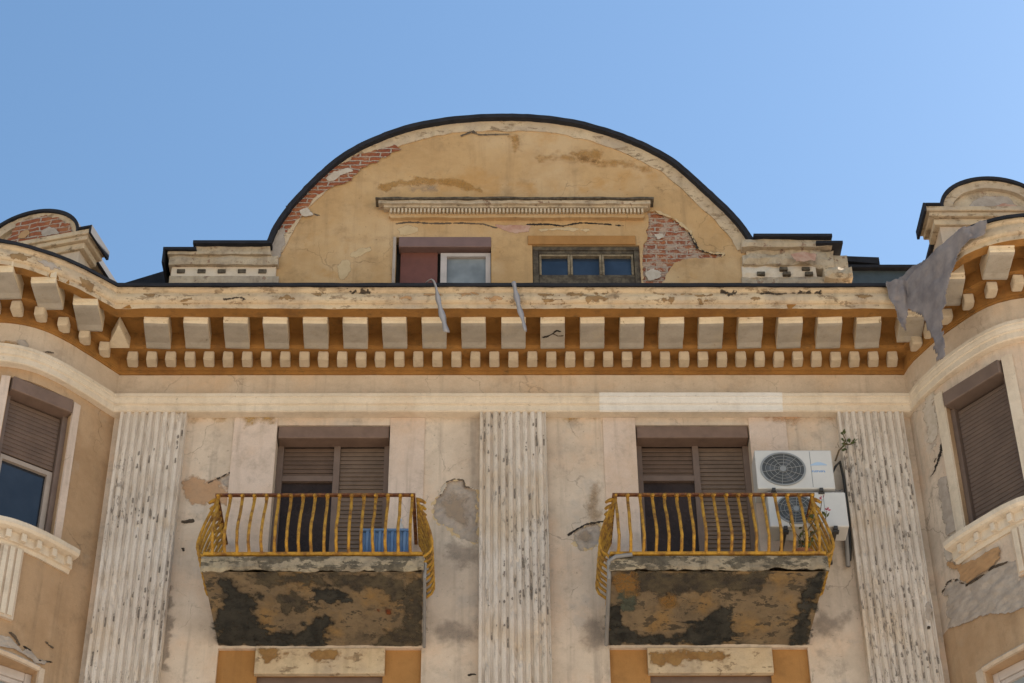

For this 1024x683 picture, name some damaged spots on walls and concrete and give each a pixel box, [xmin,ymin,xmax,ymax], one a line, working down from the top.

flaking render [271,144,401,257]
damp [379,177,482,192]
crack [526,222,623,232]
flaking render [639,210,725,283]
peeling [182,472,230,506]
flaking render [431,478,500,545]
crack [931,438,942,476]
damp [212,570,428,664]
damp [608,606,741,667]
damp [631,570,770,598]
damp [789,571,825,646]
flaking render [942,546,1024,629]